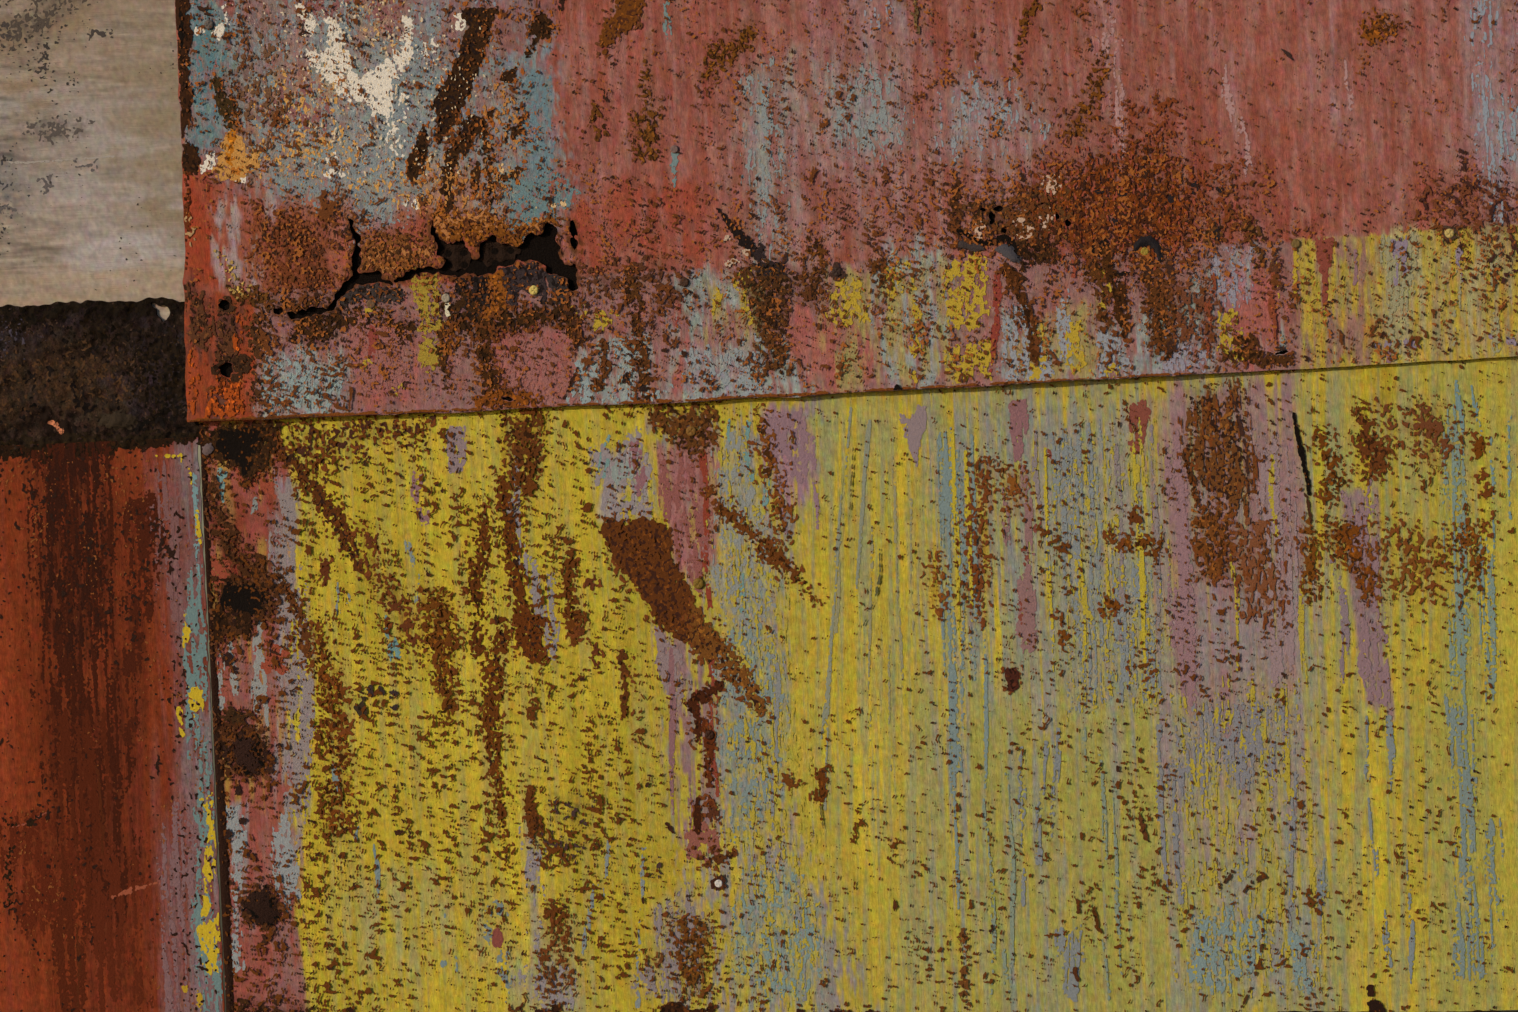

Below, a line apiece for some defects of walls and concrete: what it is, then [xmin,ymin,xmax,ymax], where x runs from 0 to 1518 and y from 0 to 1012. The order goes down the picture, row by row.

peeling [185,0,581,248]
corrosion [852,441,941,501]
corrosion [801,690,879,753]
corrosion [1462,755,1497,852]
corrosion [1464,915,1518,1008]